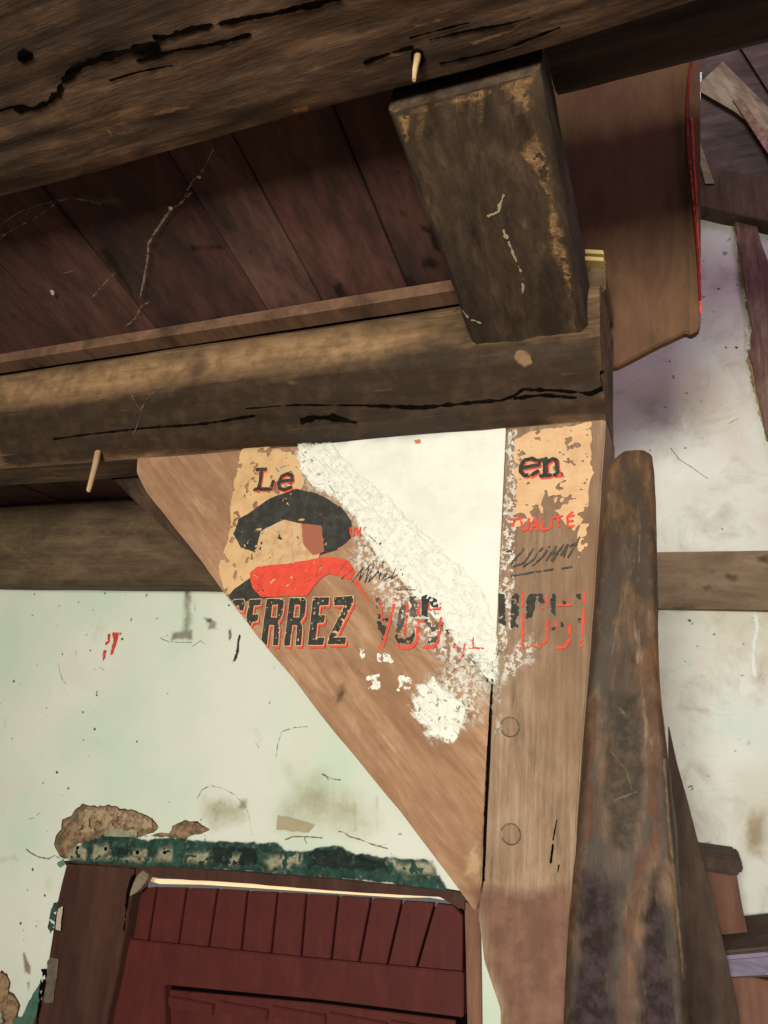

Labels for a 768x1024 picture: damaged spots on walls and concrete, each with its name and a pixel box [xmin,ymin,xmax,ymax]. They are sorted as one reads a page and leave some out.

crack [0,0,341,114]
crack [53,370,604,440]
peeling [0,338,605,744]